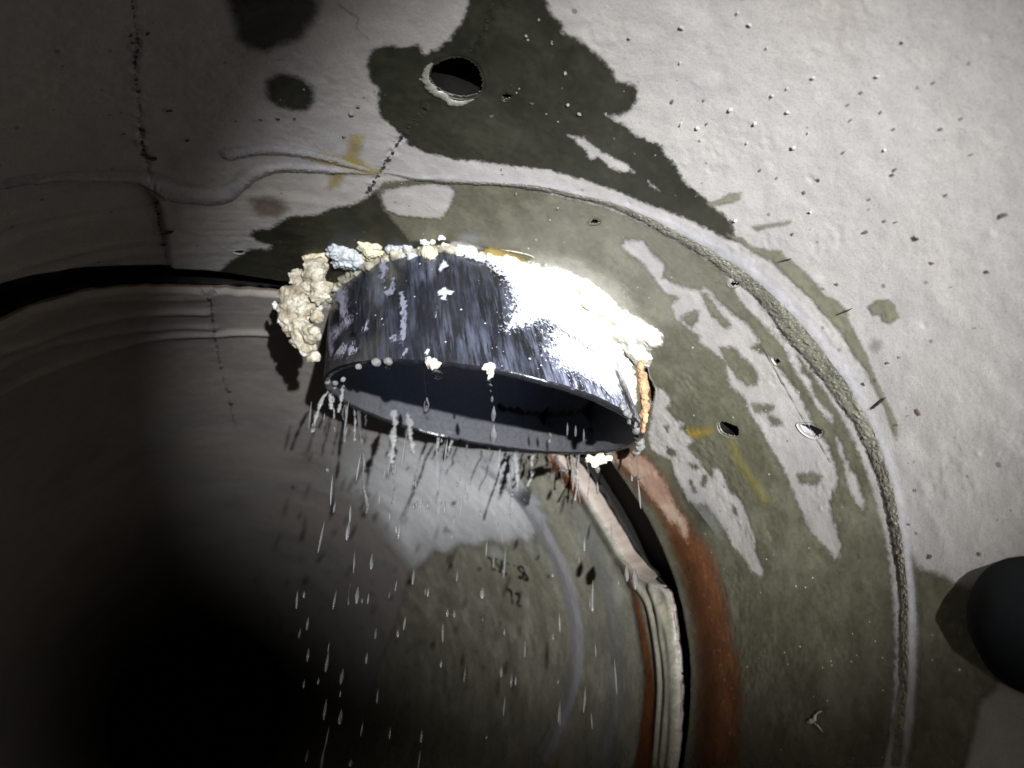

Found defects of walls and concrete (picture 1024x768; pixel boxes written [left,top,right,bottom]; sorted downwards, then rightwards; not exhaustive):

crack [128,0,174,269]
water stain [229,0,318,50]
water stain [267,75,313,110]
water stain [367,0,898,439]
water stain [218,179,899,768]
corrosion [547,454,584,503]
corrosion [612,450,740,768]